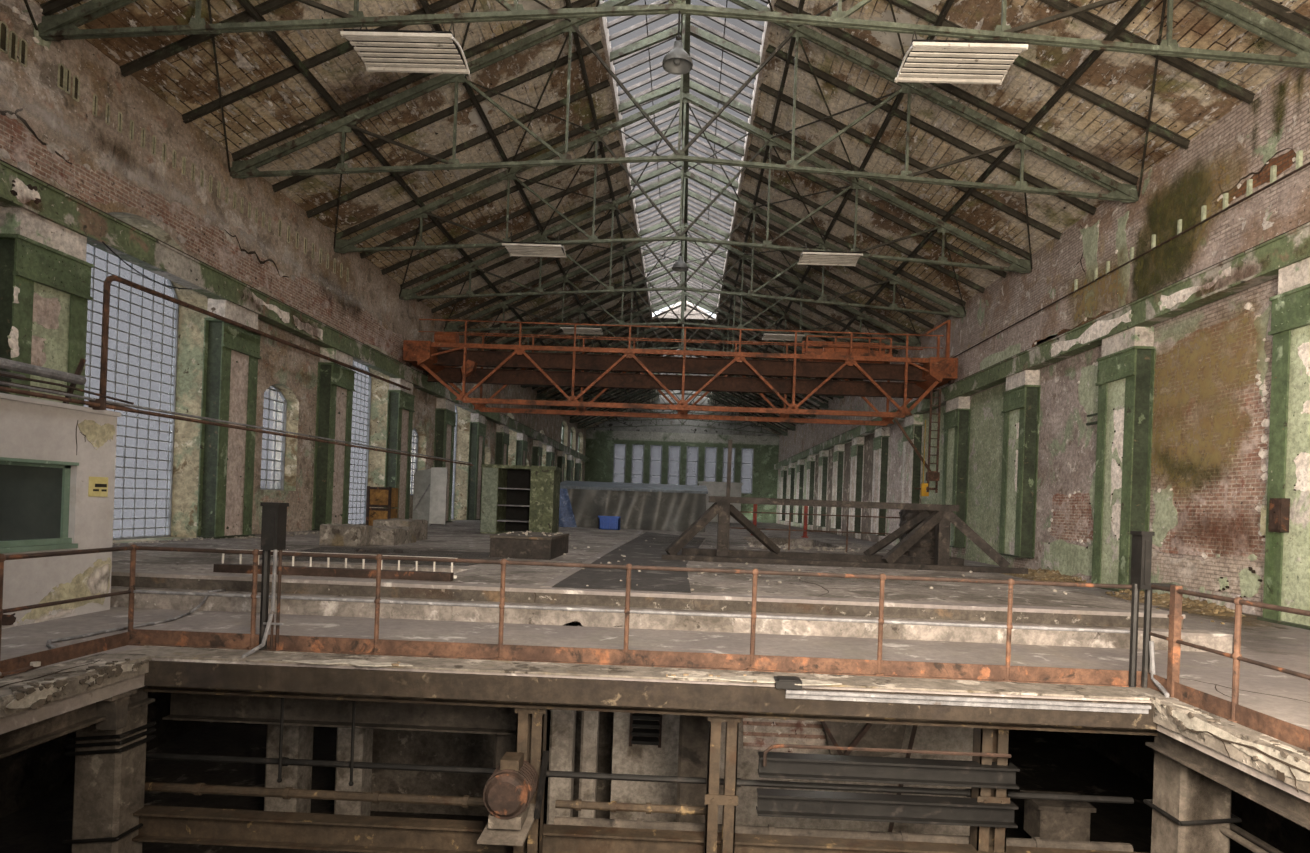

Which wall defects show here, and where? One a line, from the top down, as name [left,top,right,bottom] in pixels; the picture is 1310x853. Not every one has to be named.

crack [0,108,72,164]
spalling [0,113,406,367]
leakage [1146,158,1242,273]
leakage [1071,253,1126,323]
peeling [1158,266,1231,311]
peeling [1032,310,1132,357]
peeling [1297,342,1310,414]
peeling [1294,452,1310,492]
spalling [6,658,149,709]
spalling [1158,703,1310,782]